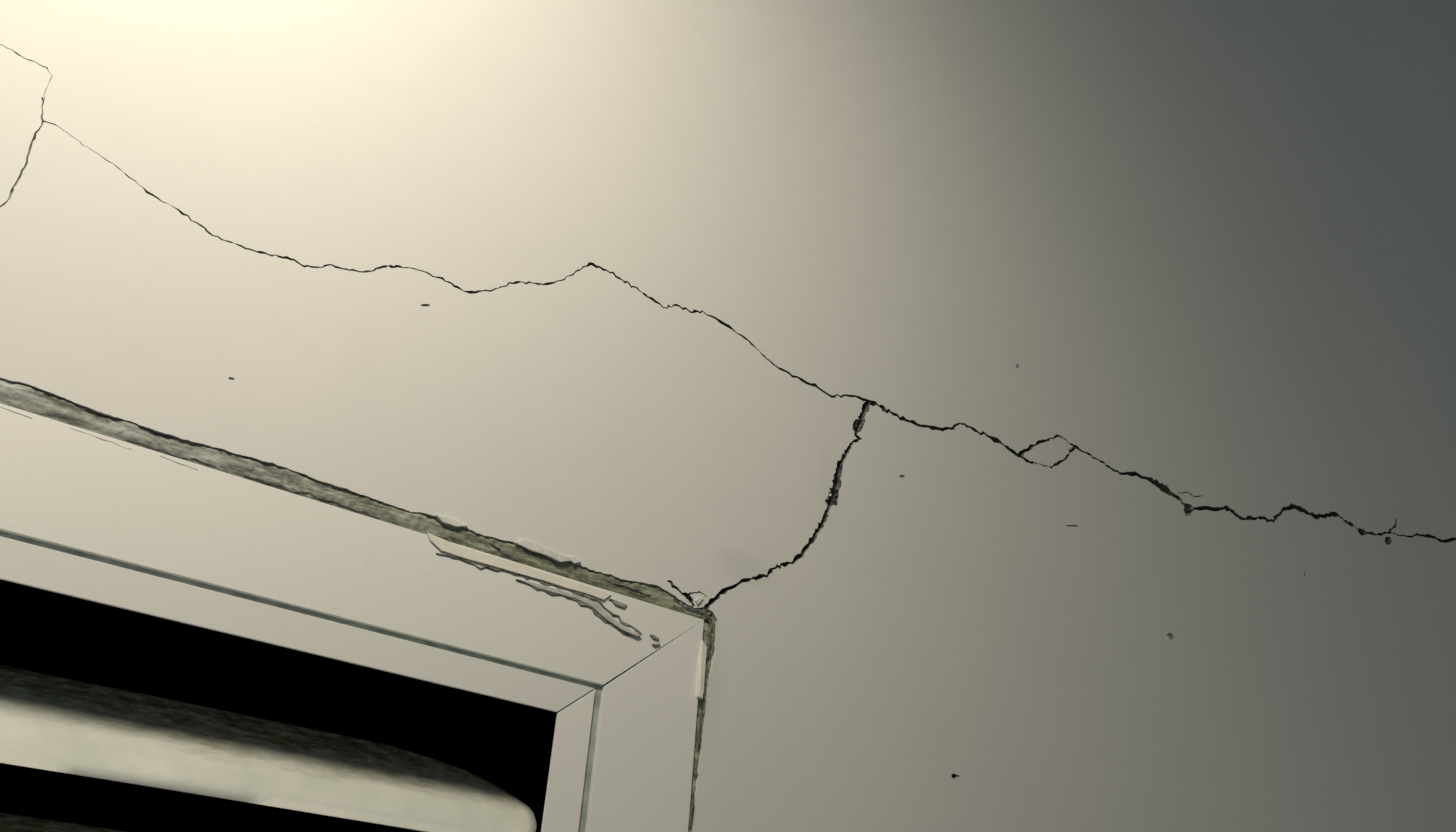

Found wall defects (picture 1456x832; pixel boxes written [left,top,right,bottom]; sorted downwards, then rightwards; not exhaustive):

crack [0,44,1456,614]
peeling [427,515,660,647]
flaking render [667,580,707,606]
peeling [696,640,707,699]